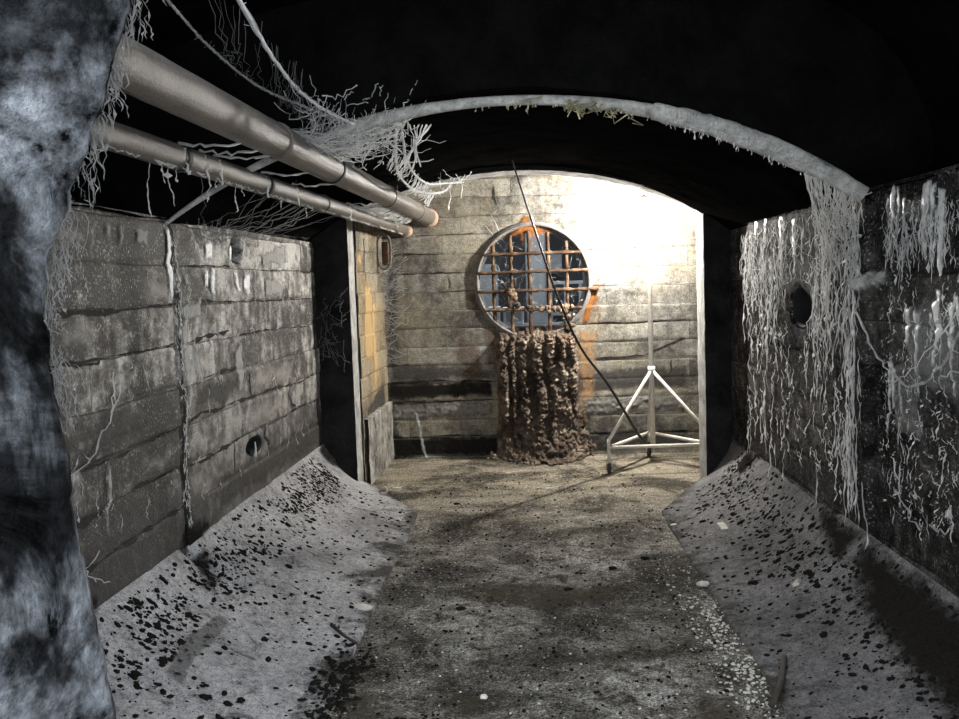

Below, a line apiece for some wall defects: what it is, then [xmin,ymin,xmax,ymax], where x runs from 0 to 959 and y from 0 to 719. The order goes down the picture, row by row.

crack [45,230,317,574]
rust [512,216,551,247]